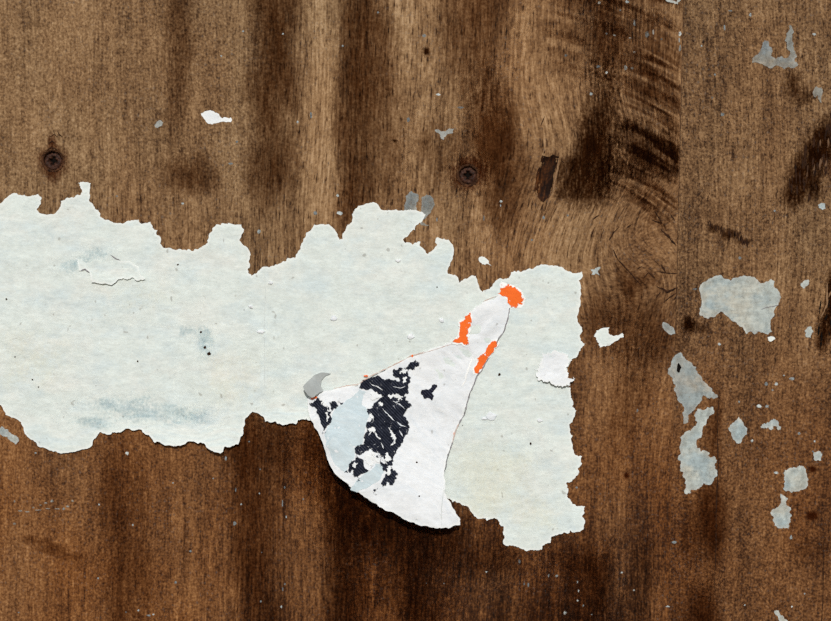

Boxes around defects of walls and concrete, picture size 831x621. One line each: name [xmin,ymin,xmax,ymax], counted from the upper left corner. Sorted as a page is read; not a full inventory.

peeling [321,389,403,492]